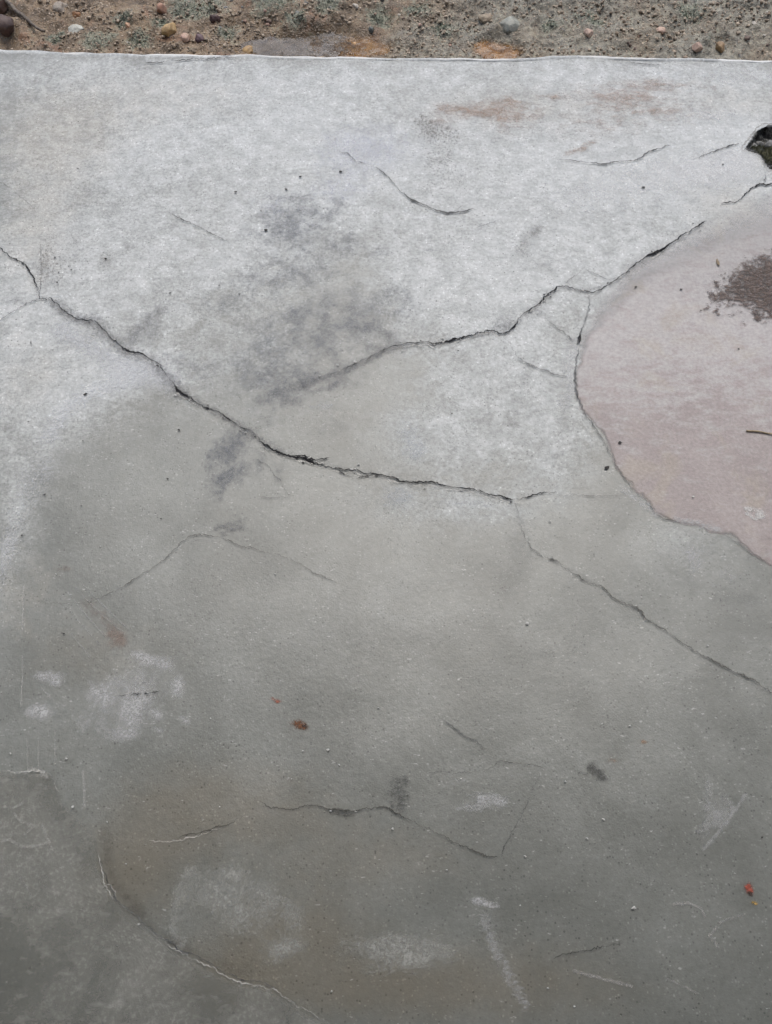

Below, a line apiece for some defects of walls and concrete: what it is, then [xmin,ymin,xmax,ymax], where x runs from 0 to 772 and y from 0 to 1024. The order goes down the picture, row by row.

crack [341,152,493,226]
crack [572,145,669,165]
crack [724,177,772,203]
spalling [741,123,772,172]
crack [0,248,558,503]
crack [319,221,705,481]
crack [523,532,772,693]
crack [262,802,504,857]